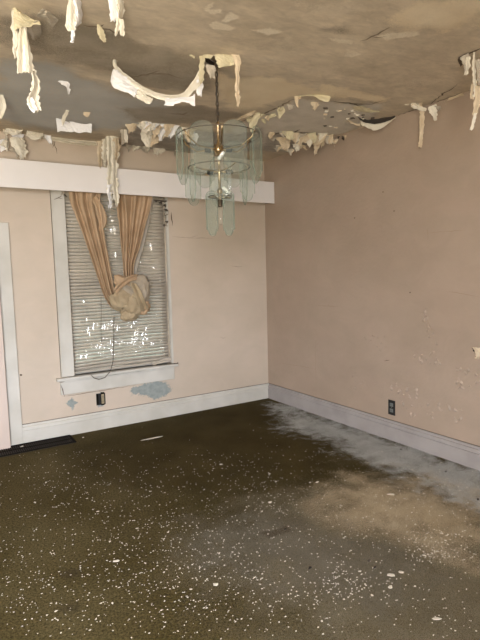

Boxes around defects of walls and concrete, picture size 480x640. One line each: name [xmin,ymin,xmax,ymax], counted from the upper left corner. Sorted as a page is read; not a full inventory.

peeling [10,0,83,113]
water stain [0,8,245,135]
flaking render [0,54,396,209]
peeling [405,103,441,148]
peeling [447,52,480,130]
peeling [130,381,171,400]